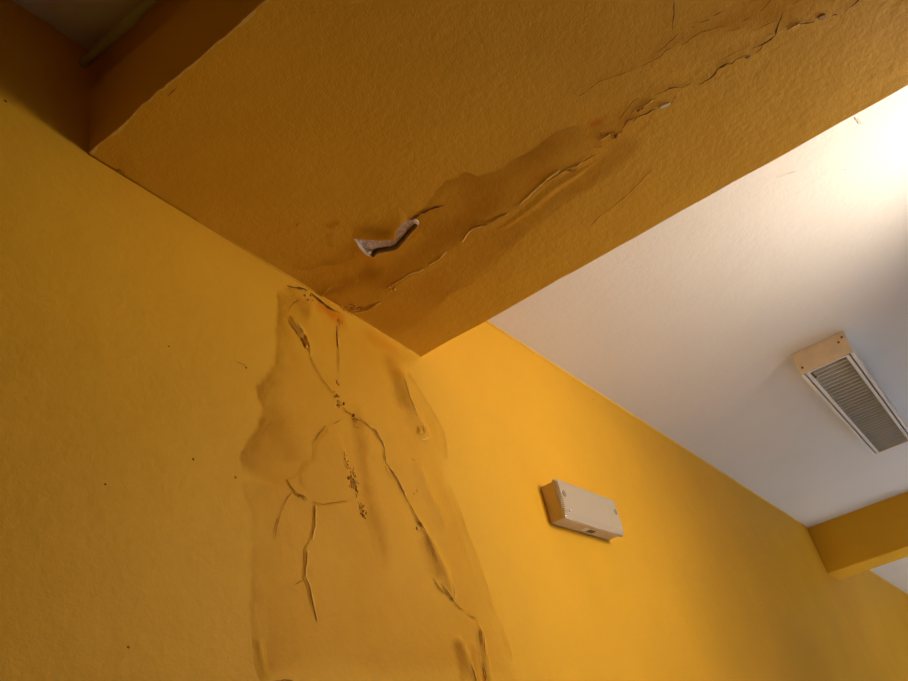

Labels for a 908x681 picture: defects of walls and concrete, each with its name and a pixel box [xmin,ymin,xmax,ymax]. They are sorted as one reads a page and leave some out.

spalling [353,205,444,257]
crack [275,0,859,559]
crack [435,581,487,681]